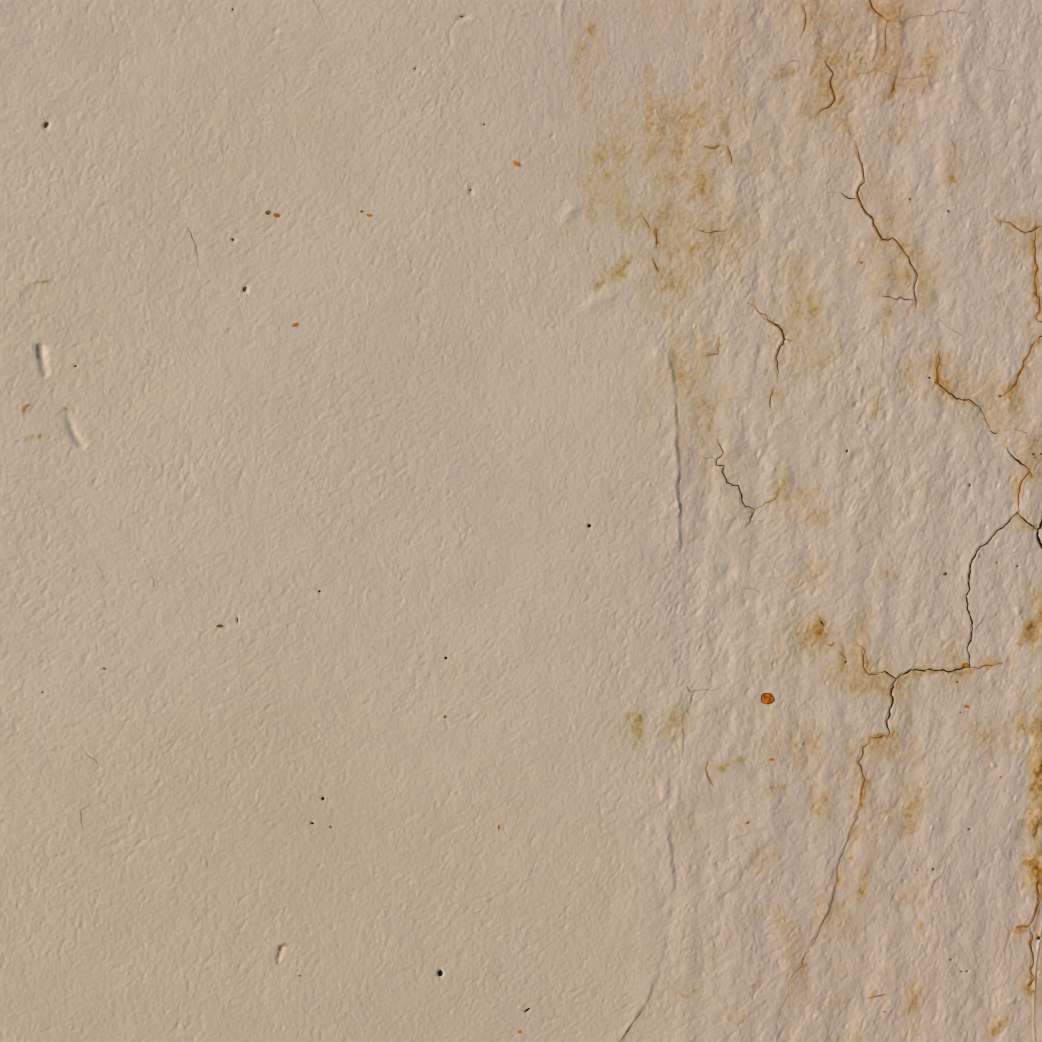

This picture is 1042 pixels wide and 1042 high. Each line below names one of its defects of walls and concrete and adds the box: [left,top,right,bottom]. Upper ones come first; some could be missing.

crack [788,0,971,337]
crack [747,303,788,405]
crack [996,218,1042,395]
crack [697,439,779,528]
rust [761,693,774,704]
crack [773,357,1042,1038]